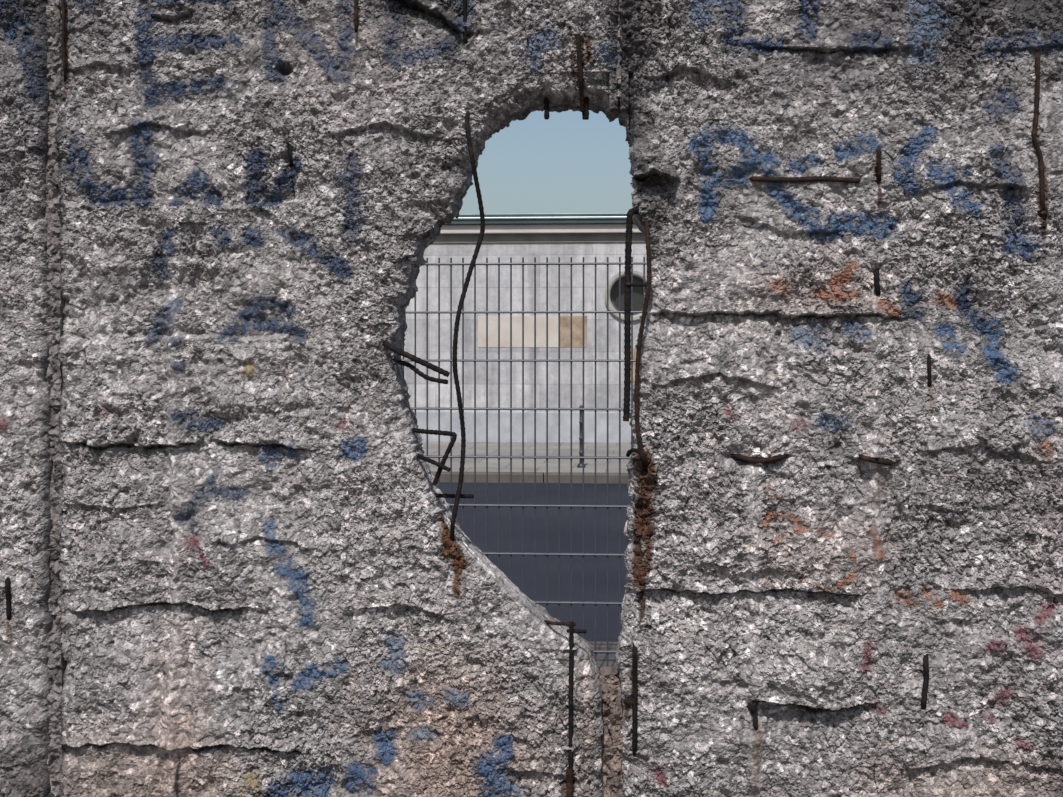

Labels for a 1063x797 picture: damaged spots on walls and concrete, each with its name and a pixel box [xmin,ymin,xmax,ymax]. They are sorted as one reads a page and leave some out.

corrosion [571,33,592,88]
spalling [490,71,623,125]
spalling [385,159,464,302]
corrosion [1038,168,1048,239]
crack [654,313,889,327]
crack [71,443,193,473]
corrosion [441,515,467,596]
corrosion [633,449,657,619]
crack [100,598,241,612]
spalling [439,541,578,662]
crack [789,702,868,713]
crack [142,744,298,797]